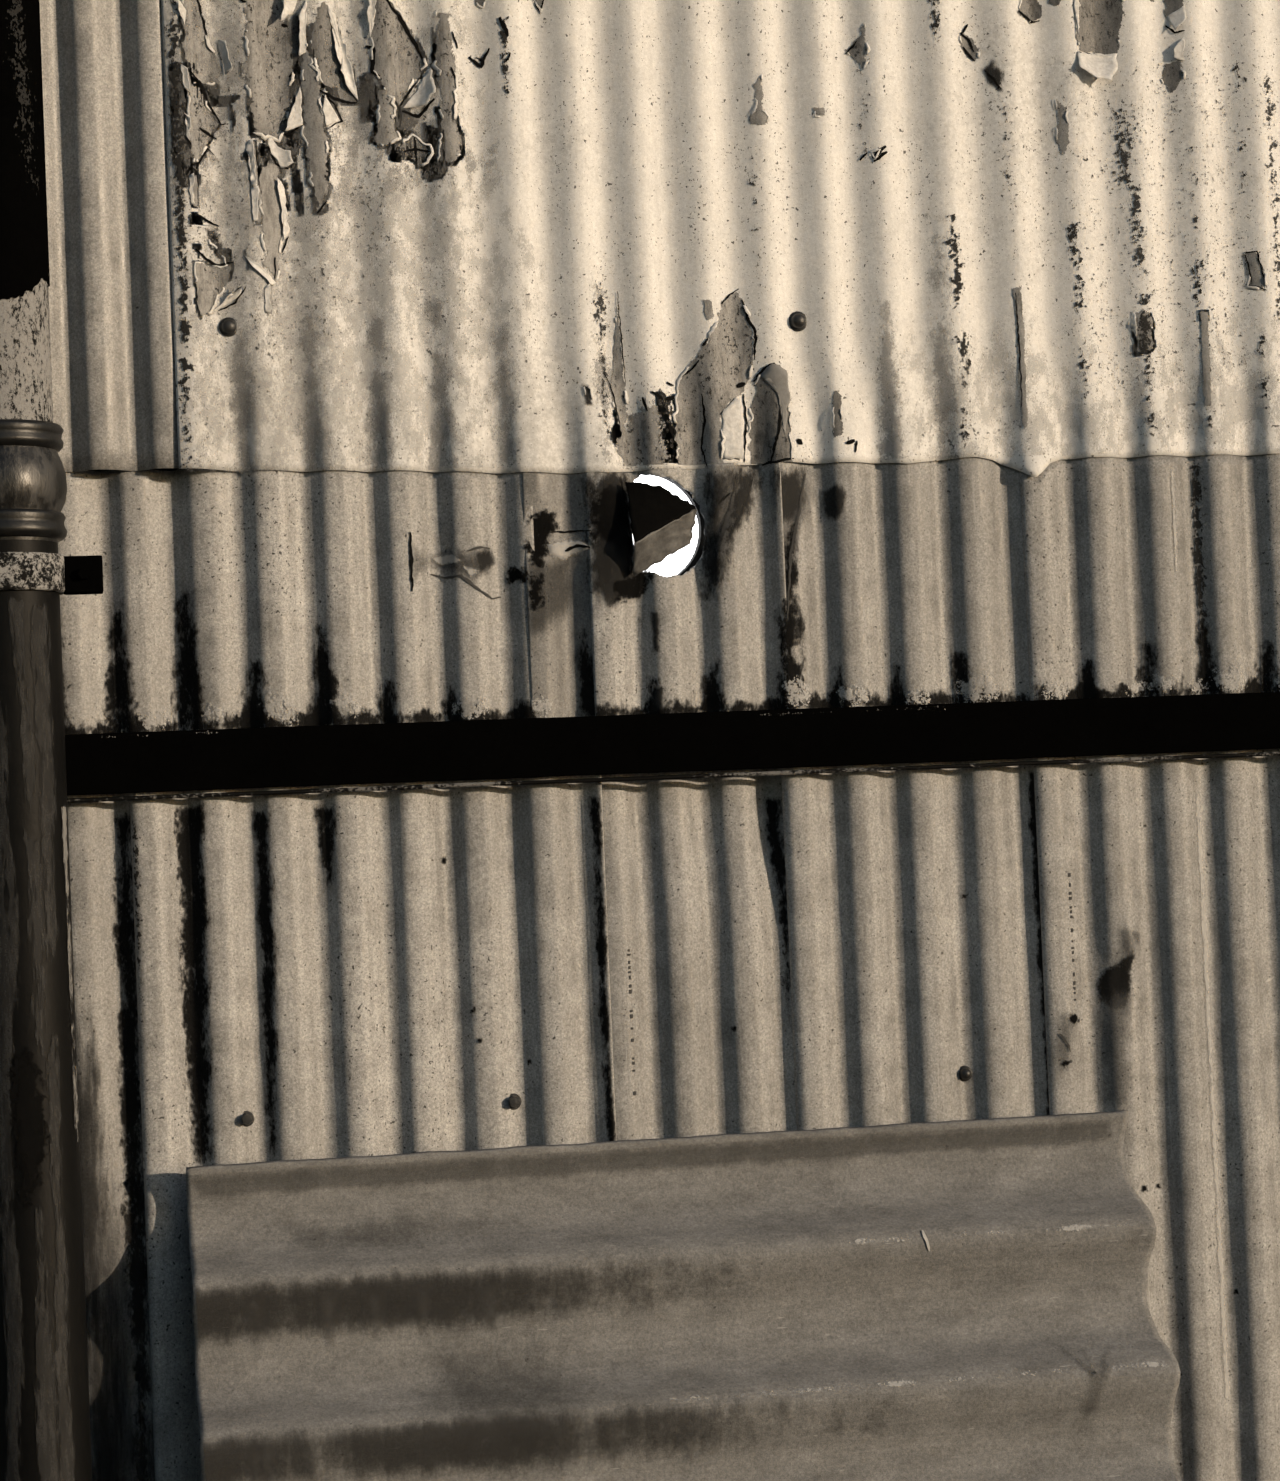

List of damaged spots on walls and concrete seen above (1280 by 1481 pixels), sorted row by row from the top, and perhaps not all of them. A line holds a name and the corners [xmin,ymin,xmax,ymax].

peeling [1018,0,1125,80]
peeling [1160,0,1186,93]
peeling [178,0,513,316]
peeling [1242,251,1268,291]
peeling [1130,308,1154,352]
peeling [582,288,803,467]
peeling [830,391,858,452]